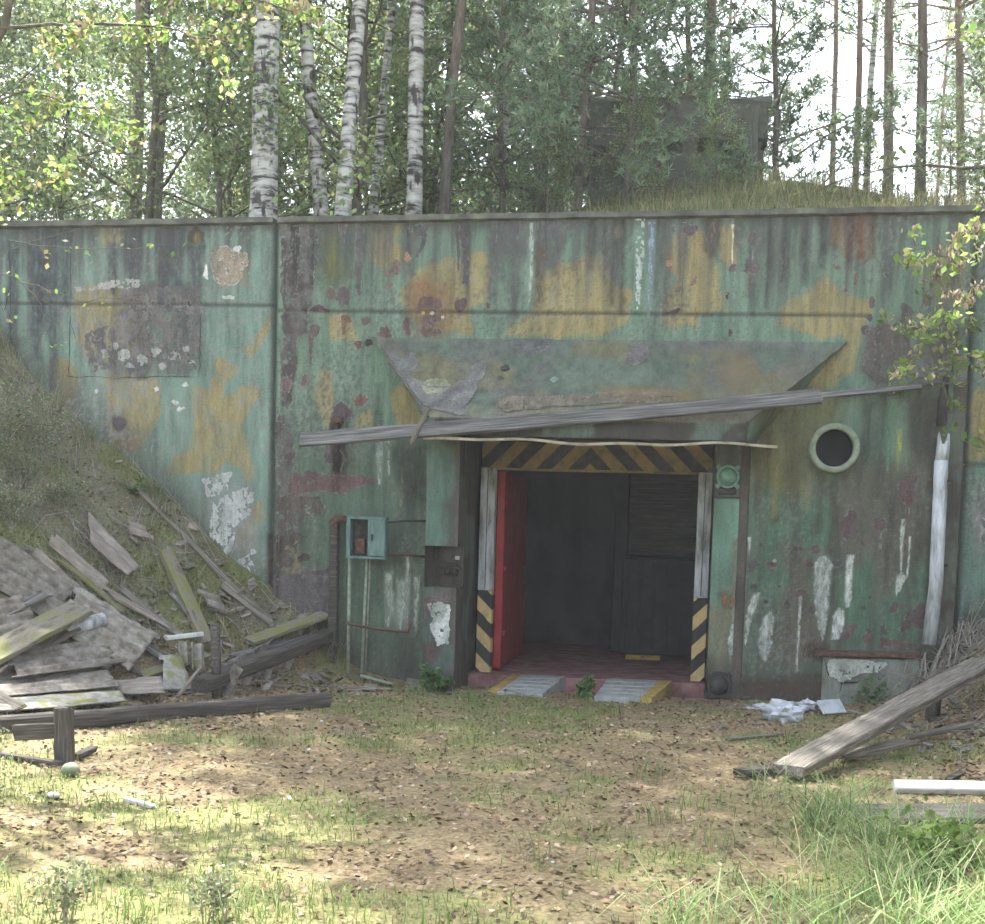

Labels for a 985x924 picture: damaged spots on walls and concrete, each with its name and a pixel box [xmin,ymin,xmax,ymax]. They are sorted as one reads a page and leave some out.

damp [488,219,655,315]
peeling [74,245,249,387]
peeling [272,221,487,624]
spalling [202,471,256,572]
spalling [427,601,451,646]
spalling [827,659,887,683]
peeling [835,602,926,649]